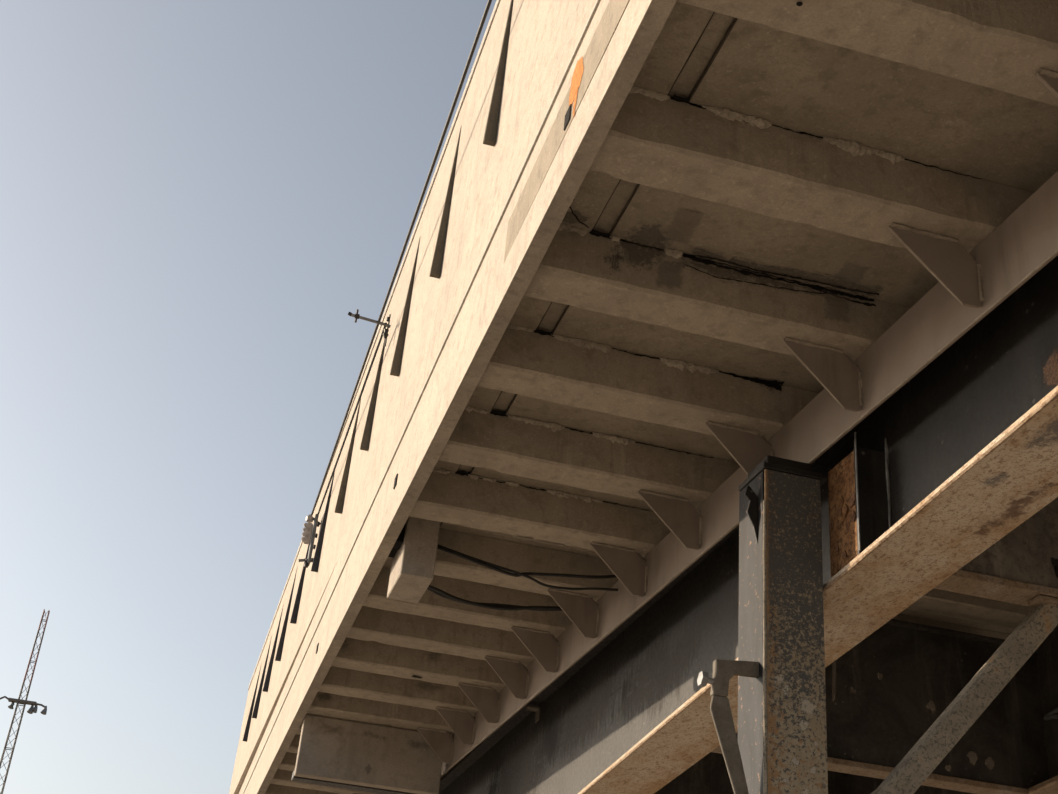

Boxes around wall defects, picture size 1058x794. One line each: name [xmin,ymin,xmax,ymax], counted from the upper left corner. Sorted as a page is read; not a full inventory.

crack [773,125,823,139]
crack [904,159,981,179]
crack [563,199,589,228]
crack [620,239,879,306]
crack [612,348,660,360]
crack [719,371,785,391]
rust [1043,352,1058,386]
rust [975,484,1054,535]